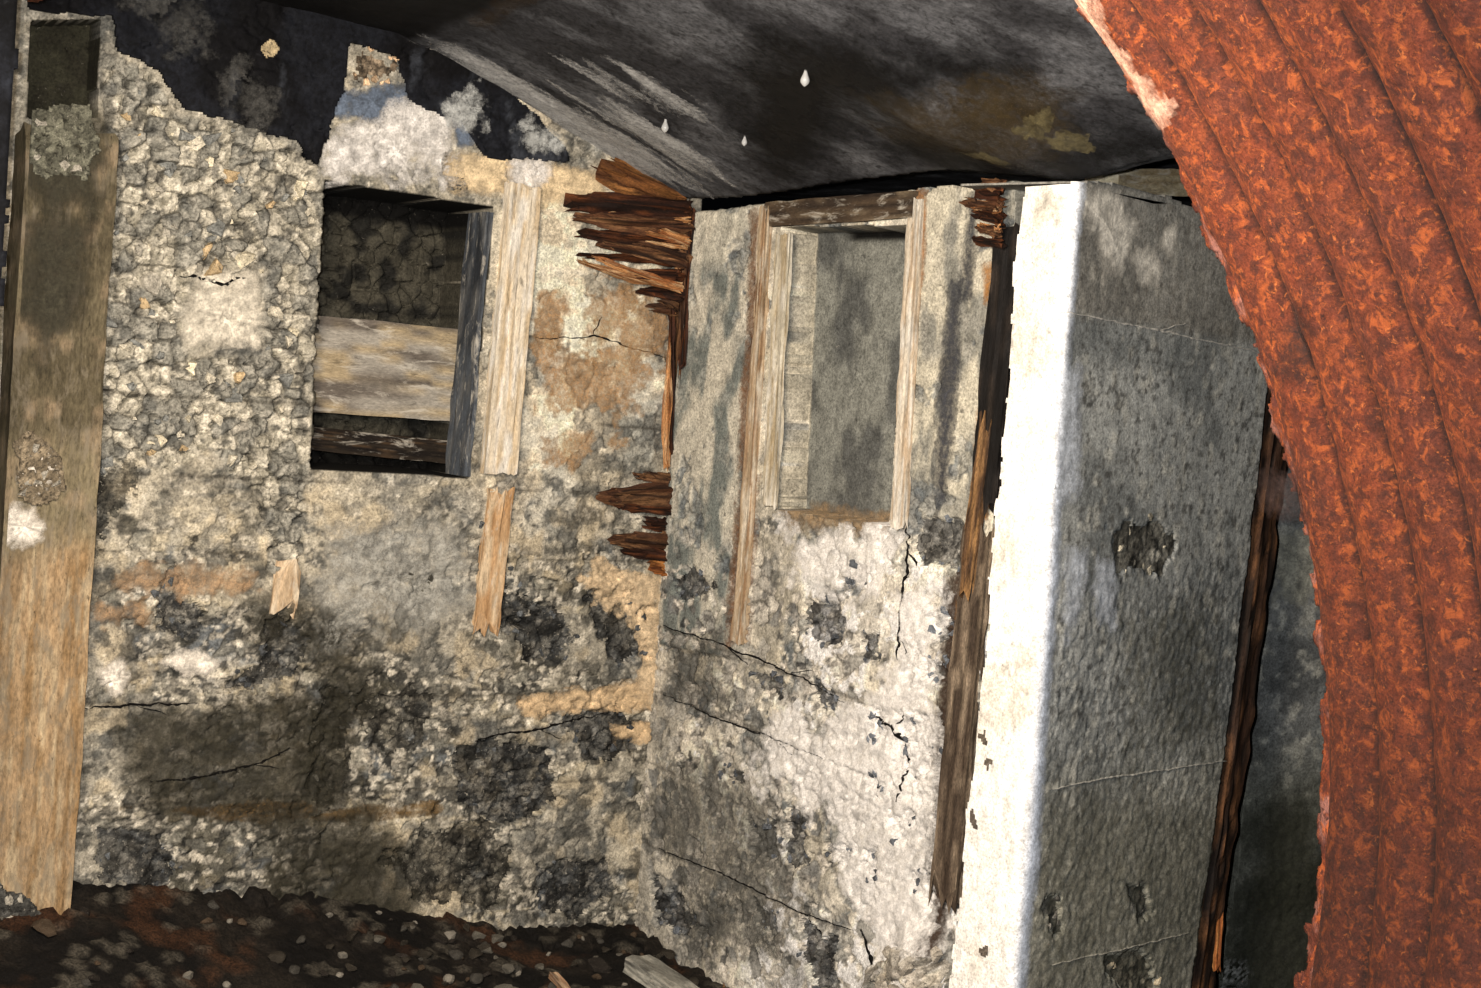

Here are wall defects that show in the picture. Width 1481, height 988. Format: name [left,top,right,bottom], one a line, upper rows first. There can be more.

peeling [26,0,570,276]
damp [735,35,1023,171]
spalling [265,306,299,350]
spalling [94,362,250,559]
damp [118,527,466,913]
damp [590,556,731,745]
crack [662,694,821,758]
crack [663,625,843,702]
crack [875,715,910,802]
crack [895,525,918,660]
damp [651,111,1198,988]
spalling [1112,513,1176,577]